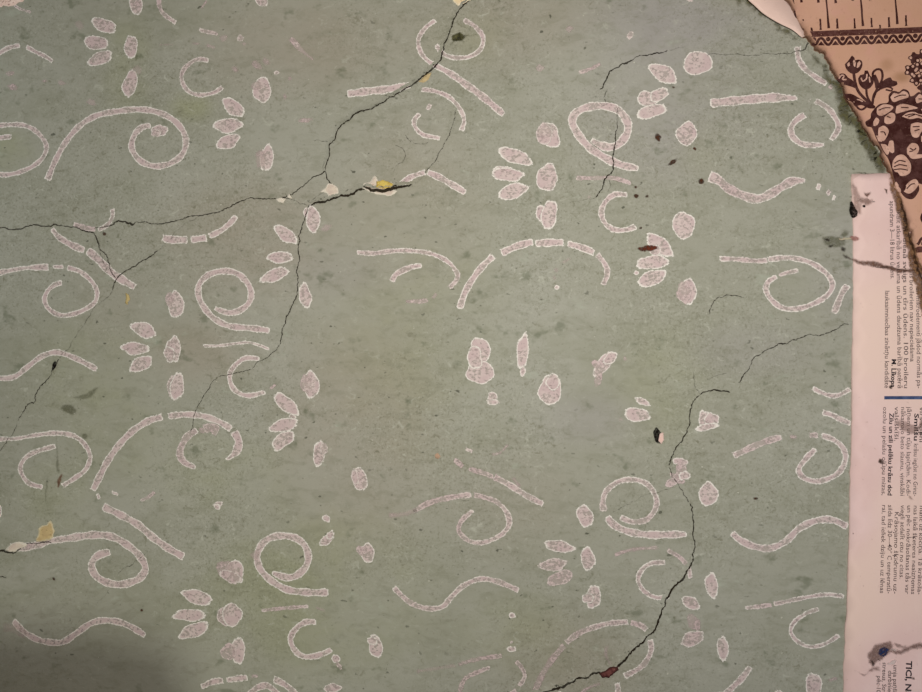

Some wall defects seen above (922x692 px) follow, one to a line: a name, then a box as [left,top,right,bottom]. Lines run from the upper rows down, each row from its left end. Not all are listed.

peeling [749,0,804,37]
crack [0,0,469,431]
crack [0,350,67,451]
crack [526,324,848,692]